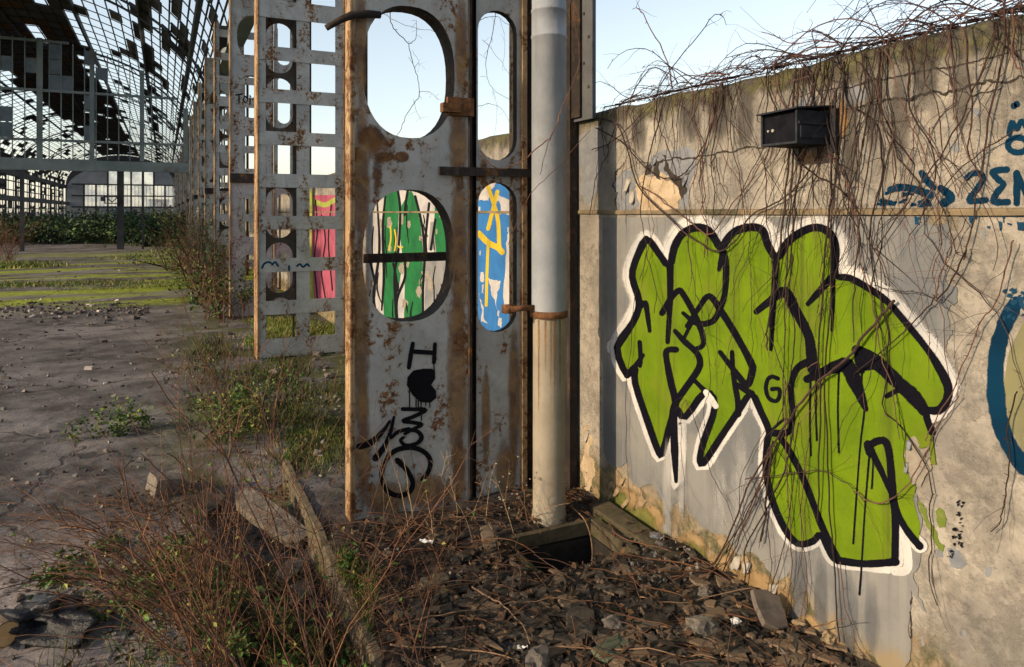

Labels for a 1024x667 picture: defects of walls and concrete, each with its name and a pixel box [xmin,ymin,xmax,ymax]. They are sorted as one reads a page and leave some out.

flaking render [614,146,697,210]
corrosion [355,0,467,515]
corrosion [482,335,520,491]
flaking render [580,424,595,492]
spalling [501,464,688,576]
spalling [730,555,752,574]
spalling [769,584,785,594]